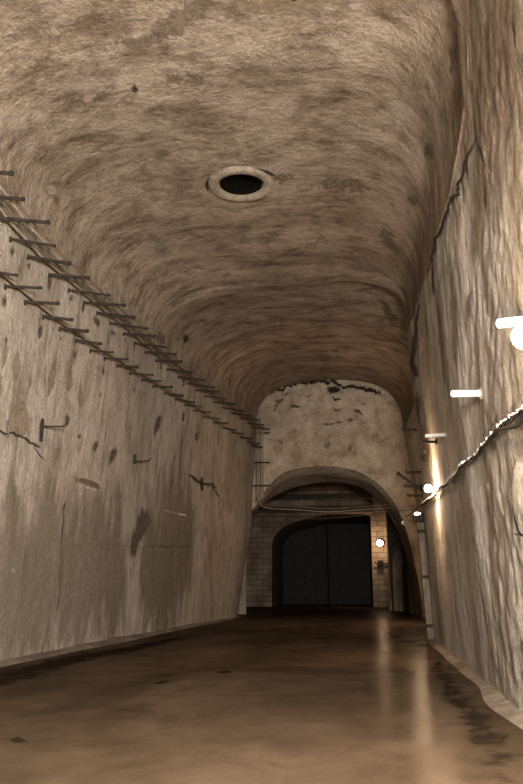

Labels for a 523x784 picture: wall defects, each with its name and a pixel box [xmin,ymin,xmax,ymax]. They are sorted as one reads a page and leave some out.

crack [414,117,486,314]
crack [271,380,381,395]
water stain [0,466,193,687]